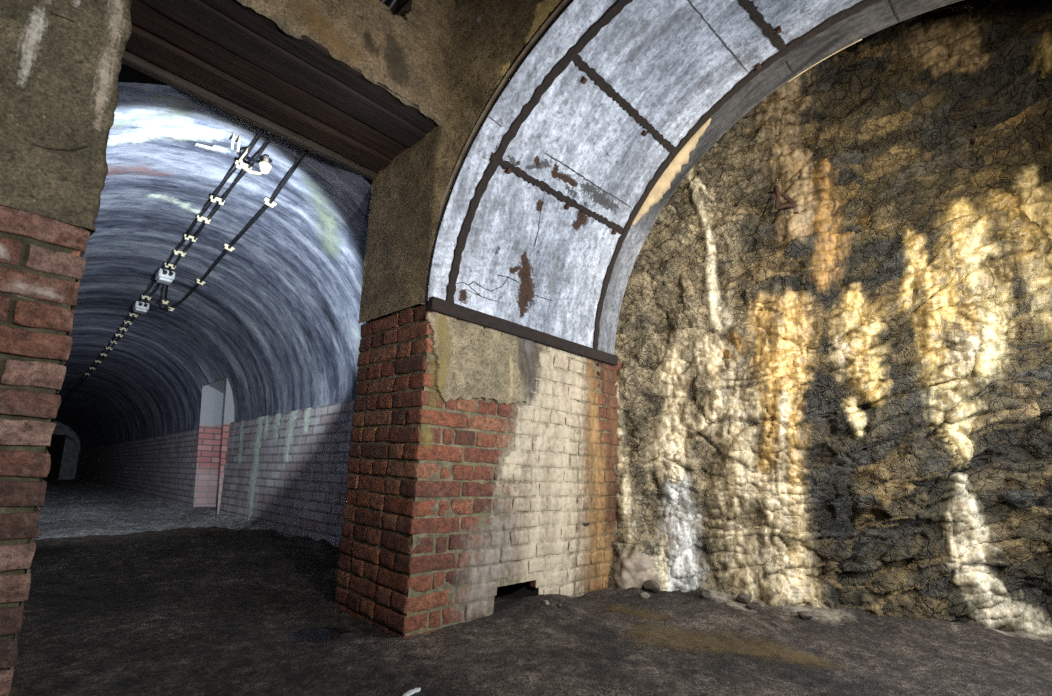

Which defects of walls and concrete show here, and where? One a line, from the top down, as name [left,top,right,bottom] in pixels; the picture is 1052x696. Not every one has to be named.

water stain [20,0,50,85]
water stain [93,0,125,131]
corrosion [534,156,578,188]
corrosion [572,210,588,231]
corrosion [510,252,536,318]
peeling [426,312,538,405]
crack [1005,340,1052,353]
crack [792,382,996,470]
water stain [462,338,595,618]
corrosion [585,359,619,590]
crack [884,518,928,526]
crack [909,478,935,486]